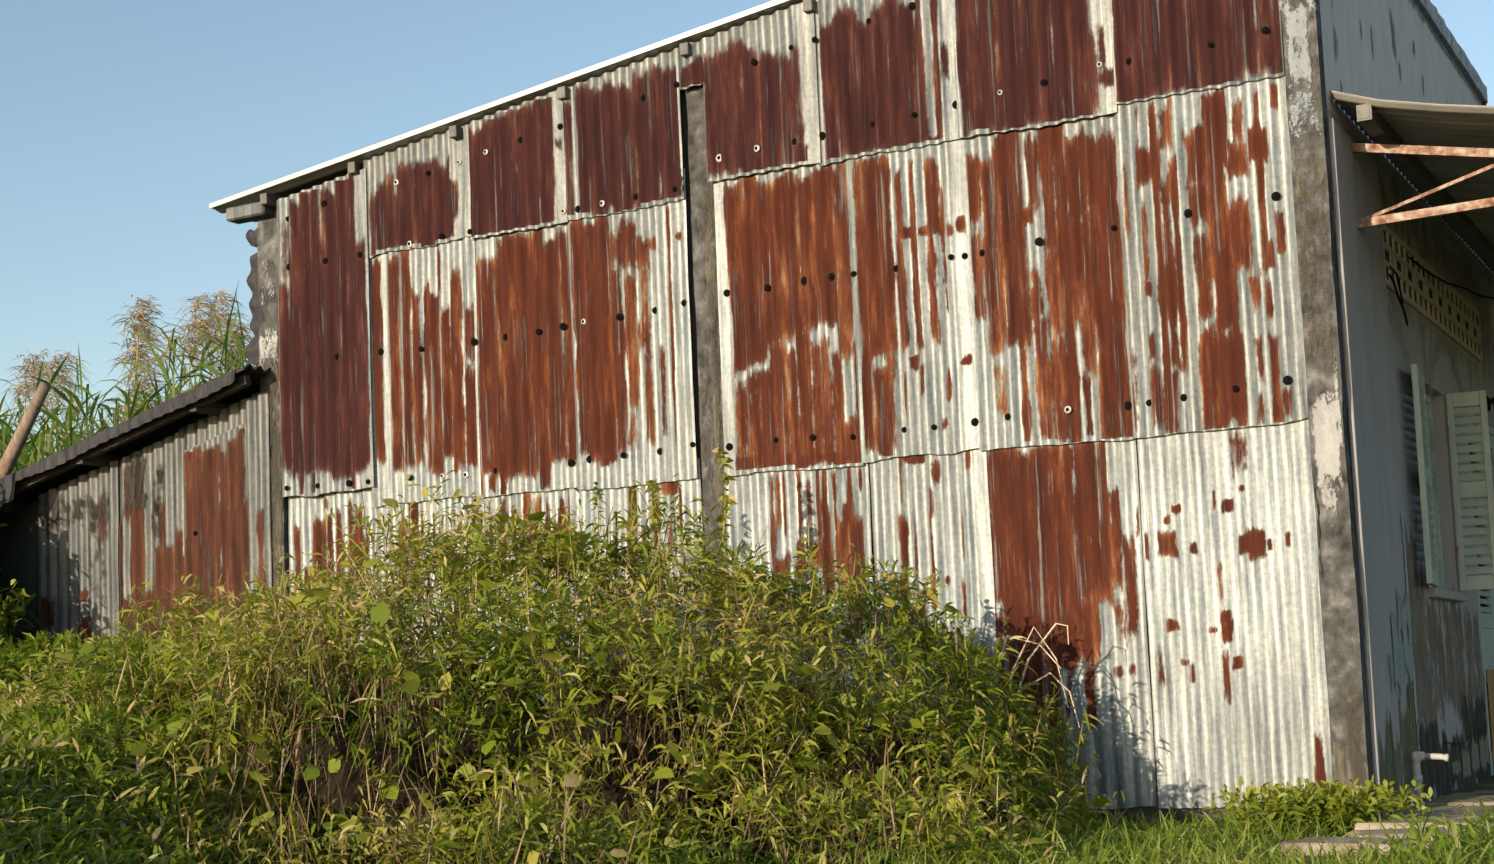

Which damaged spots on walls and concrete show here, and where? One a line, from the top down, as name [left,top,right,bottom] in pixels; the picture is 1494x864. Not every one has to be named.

rust [279,0,1293,770]
peeling [1312,361,1344,526]
rust [78,589,91,644]
rust [99,428,266,648]
rust [1314,735,1326,788]
leakage [1331,678,1492,814]